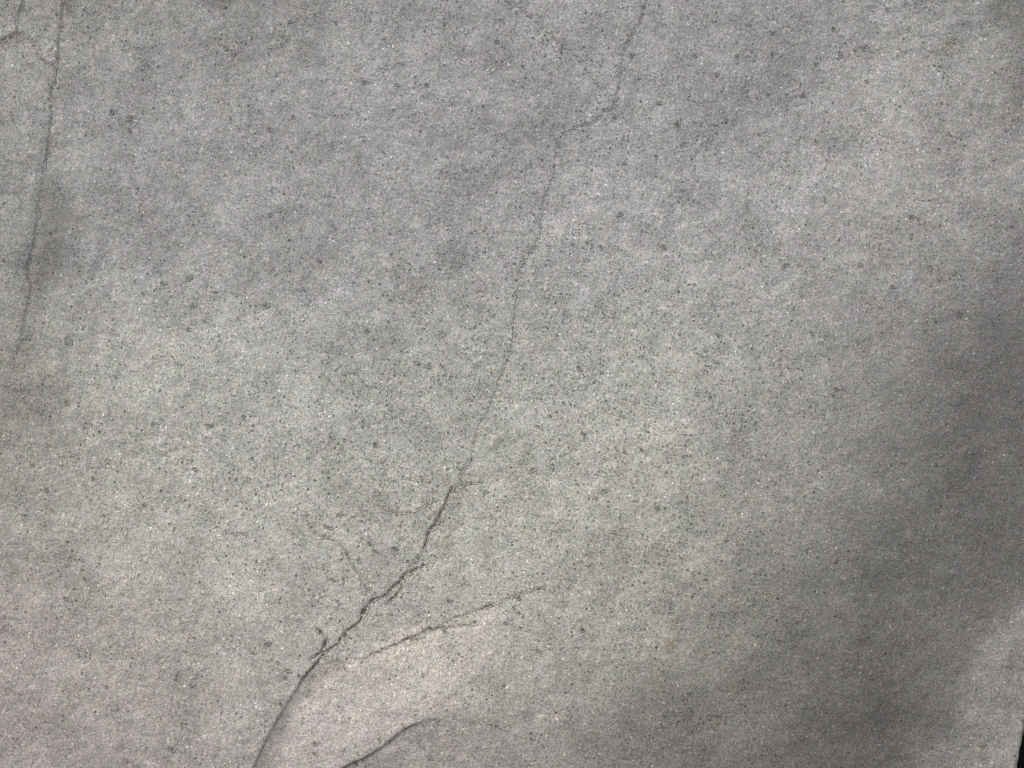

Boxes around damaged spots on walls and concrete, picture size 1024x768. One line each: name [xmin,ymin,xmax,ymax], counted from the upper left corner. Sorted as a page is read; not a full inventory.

crack [296,0,647,687]
crack [342,722,435,768]